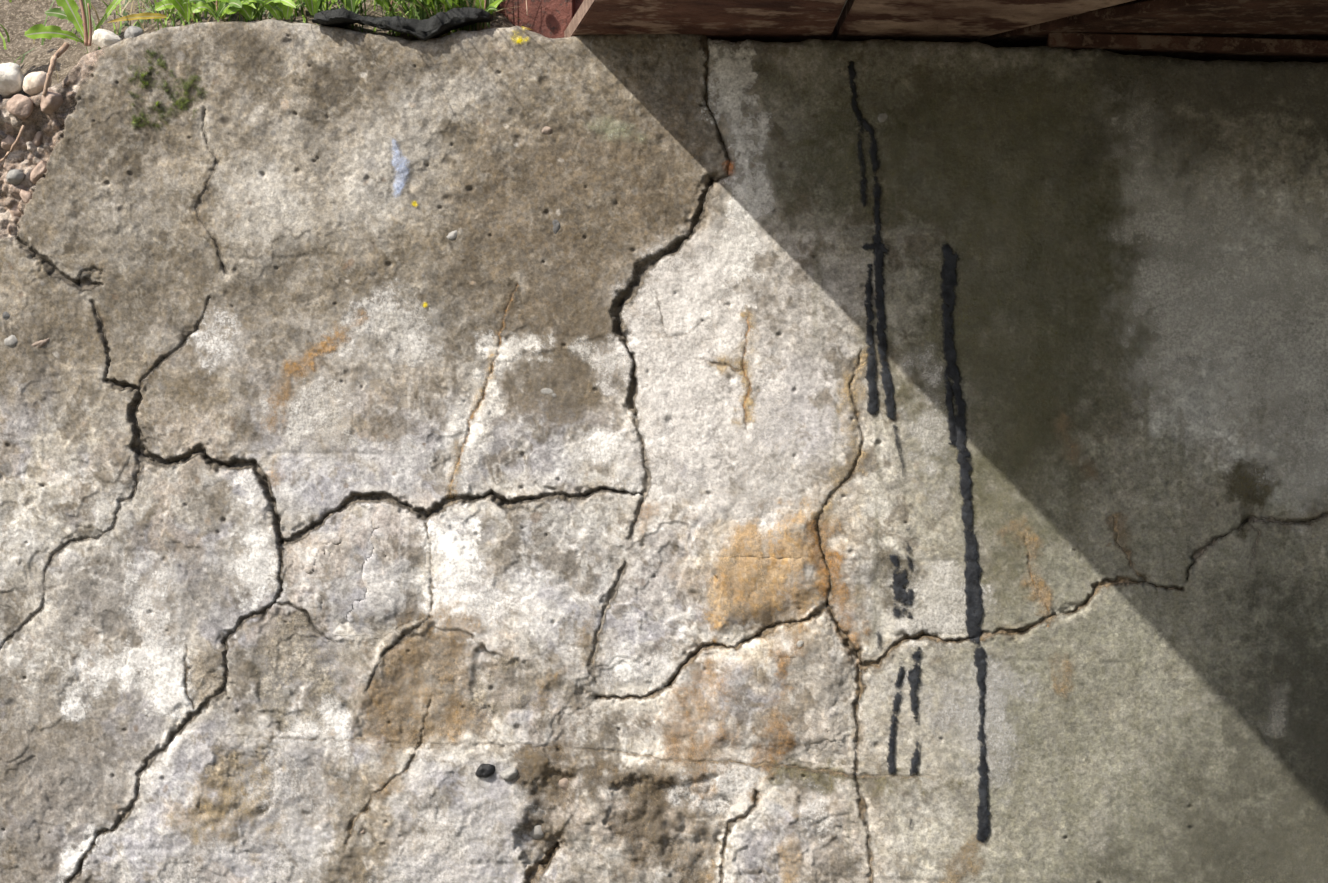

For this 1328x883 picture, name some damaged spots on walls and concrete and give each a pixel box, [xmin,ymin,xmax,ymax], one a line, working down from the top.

spalling [0,47,107,239]
efflorescence [191,319,237,367]
rust [271,311,367,425]
crack [5,35,731,883]
efflorescence [324,289,435,366]
crack [711,318,751,420]
rust [712,357,754,424]
rust [829,353,868,486]
leakage [446,38,1328,551]
rust [704,499,867,650]
leakage [870,553,967,647]
crack [587,359,1328,883]